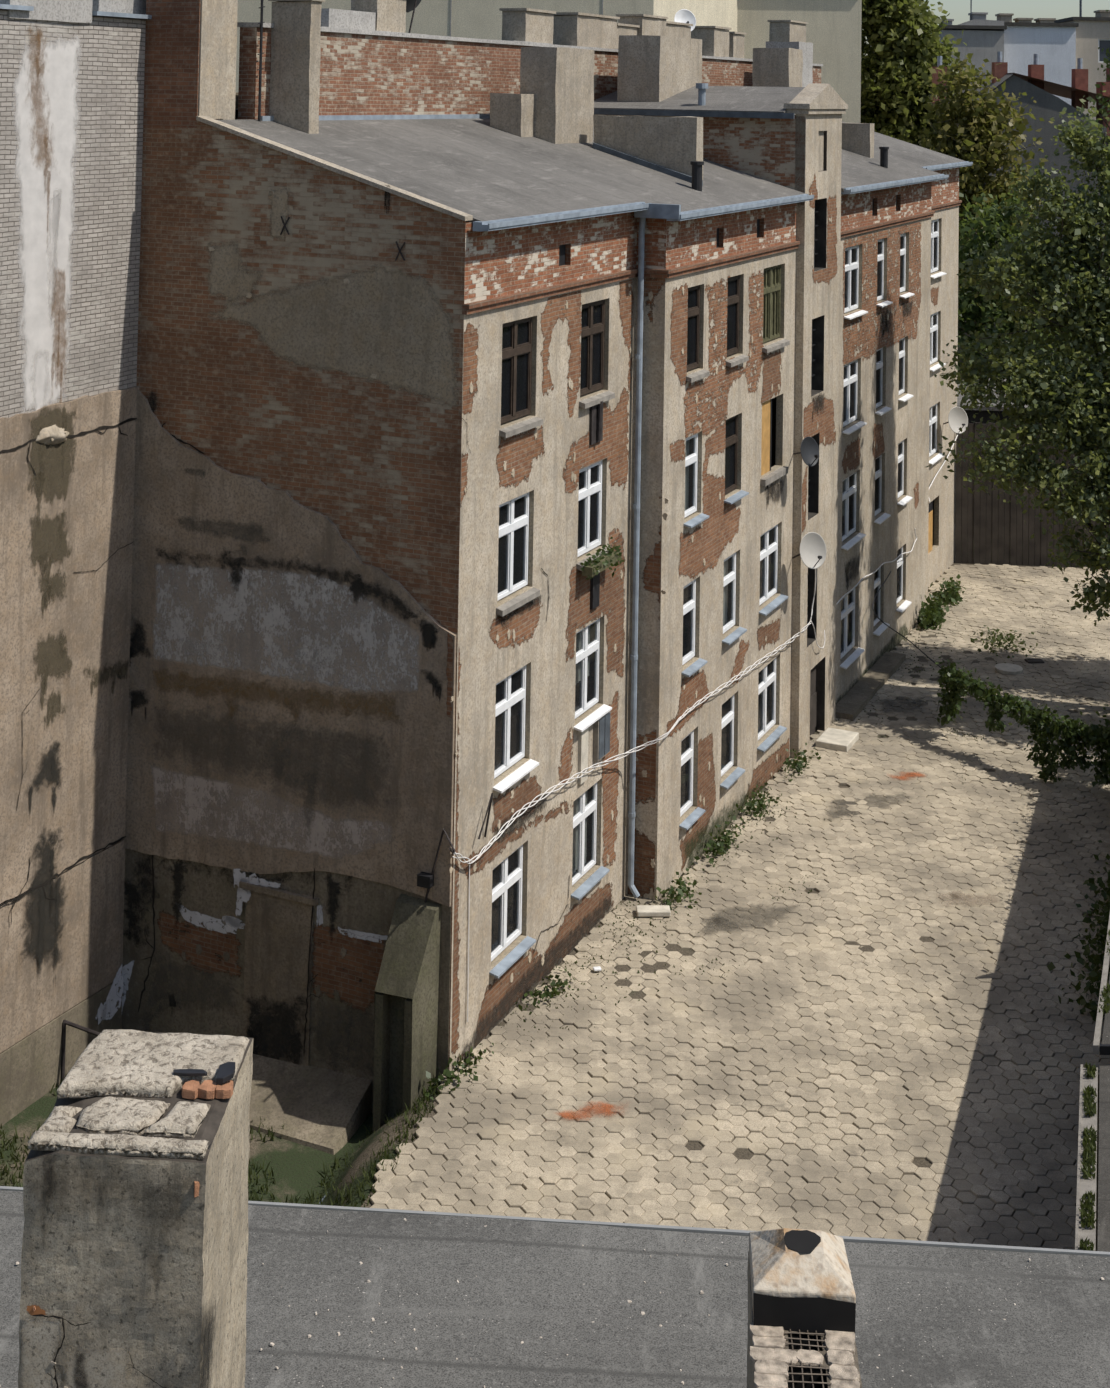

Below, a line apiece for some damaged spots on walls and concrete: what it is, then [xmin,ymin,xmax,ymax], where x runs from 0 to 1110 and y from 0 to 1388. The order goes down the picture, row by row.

damp [15,38,80,614]
crack [0,408,204,475]
flaking render [496,425,545,488]
flaking render [541,290,582,418]
flaking render [563,271,782,581]
damp [157,518,437,648]
damp [23,832,67,981]
crack [0,836,155,1012]
damp [29,622,399,824]
flaking render [446,633,574,1061]
flaking render [476,490,709,1038]
crack [32,1314,91,1388]